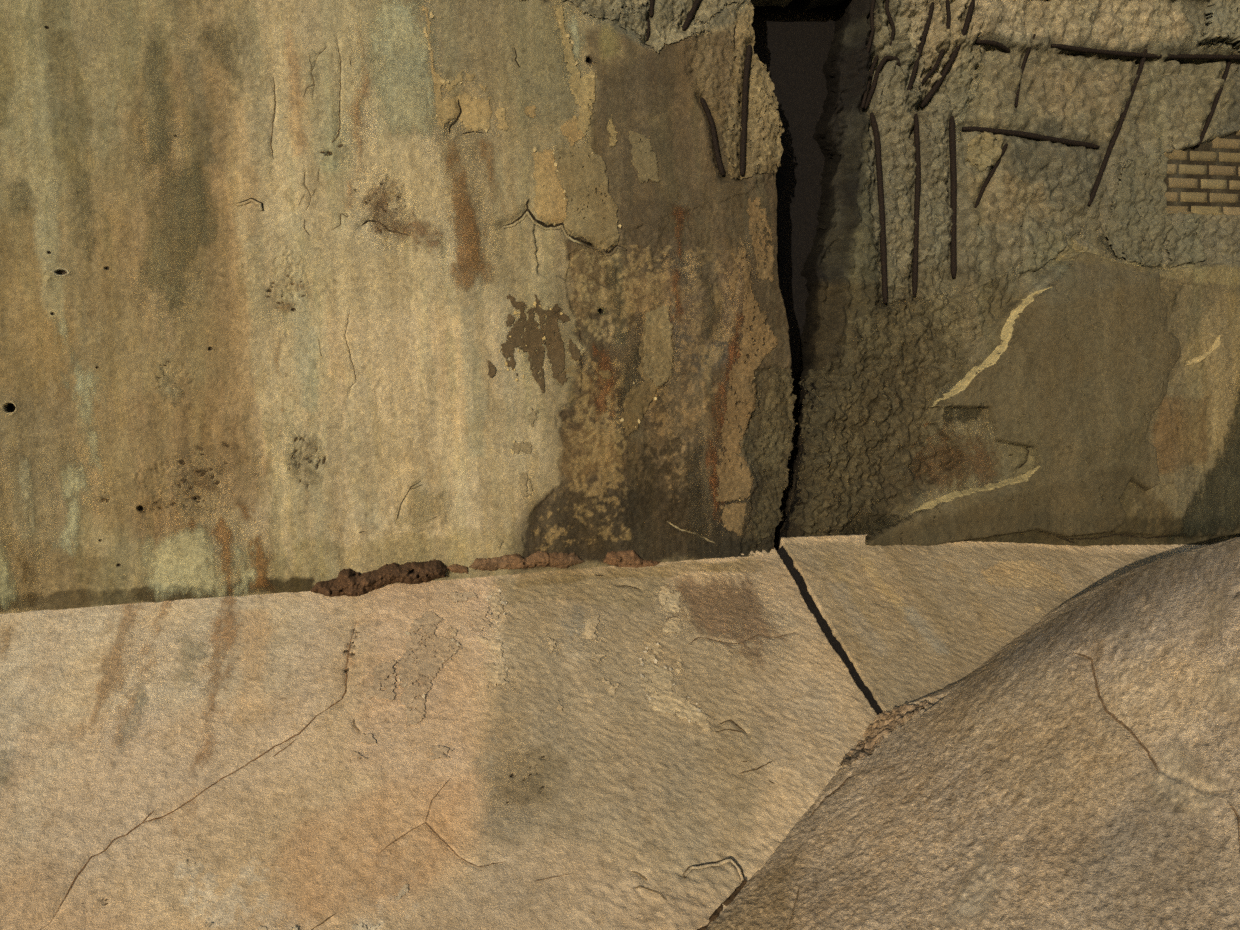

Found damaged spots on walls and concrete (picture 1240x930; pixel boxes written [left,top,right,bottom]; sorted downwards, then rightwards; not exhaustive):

water stain [370,0,436,135]
flaking render [531,0,784,251]
rust [392,157,484,287]
spalling [715,0,1240,544]
peeling [485,294,580,393]
flaking render [620,306,676,437]
water stain [60,366,100,554]
water stain [1169,392,1240,541]
water stain [139,526,256,597]
crack [39,620,359,930]
crack [378,780,505,867]
crack [631,858,744,901]